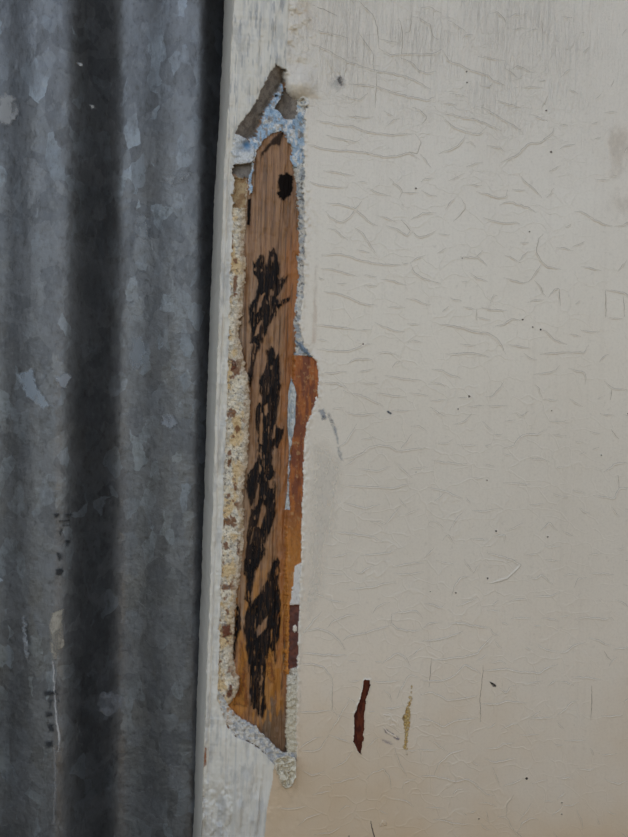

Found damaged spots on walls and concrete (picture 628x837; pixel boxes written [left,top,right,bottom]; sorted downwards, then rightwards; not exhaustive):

spalling [217,65,319,789]
crack [343,434,467,490]
crack [307,0,628,462]
spalling [353,680,371,754]